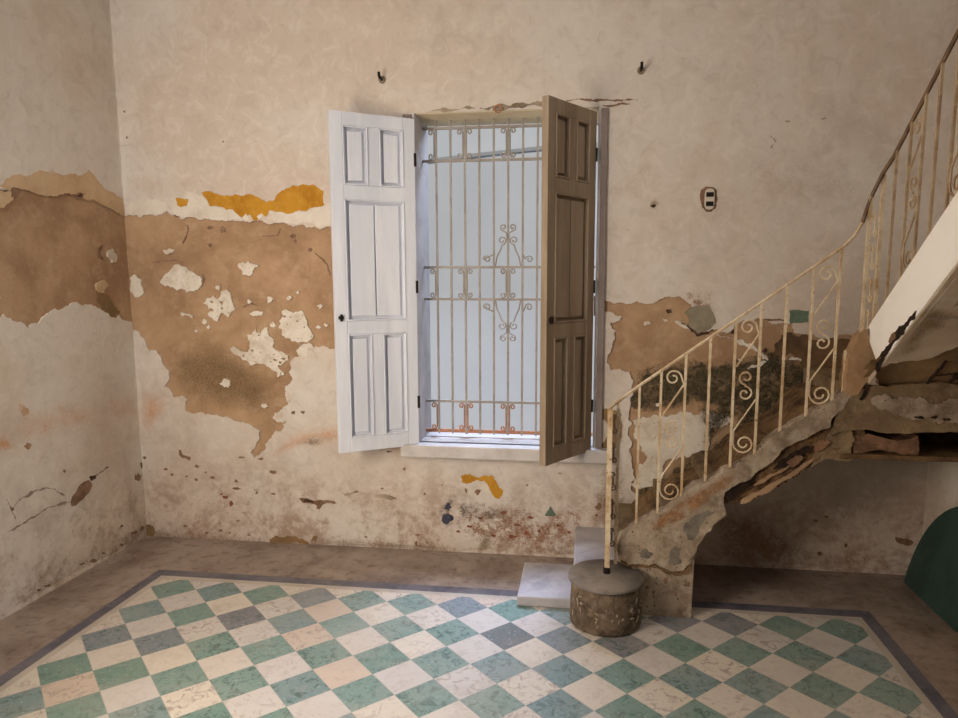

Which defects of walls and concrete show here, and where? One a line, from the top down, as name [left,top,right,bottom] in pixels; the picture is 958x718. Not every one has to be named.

spalling [0,170,335,460]
spalling [594,296,852,496]
spalling [847,311,958,431]
crack [6,487,68,532]
spalling [71,475,96,506]
spalling [299,498,336,510]
spalling [439,474,615,553]